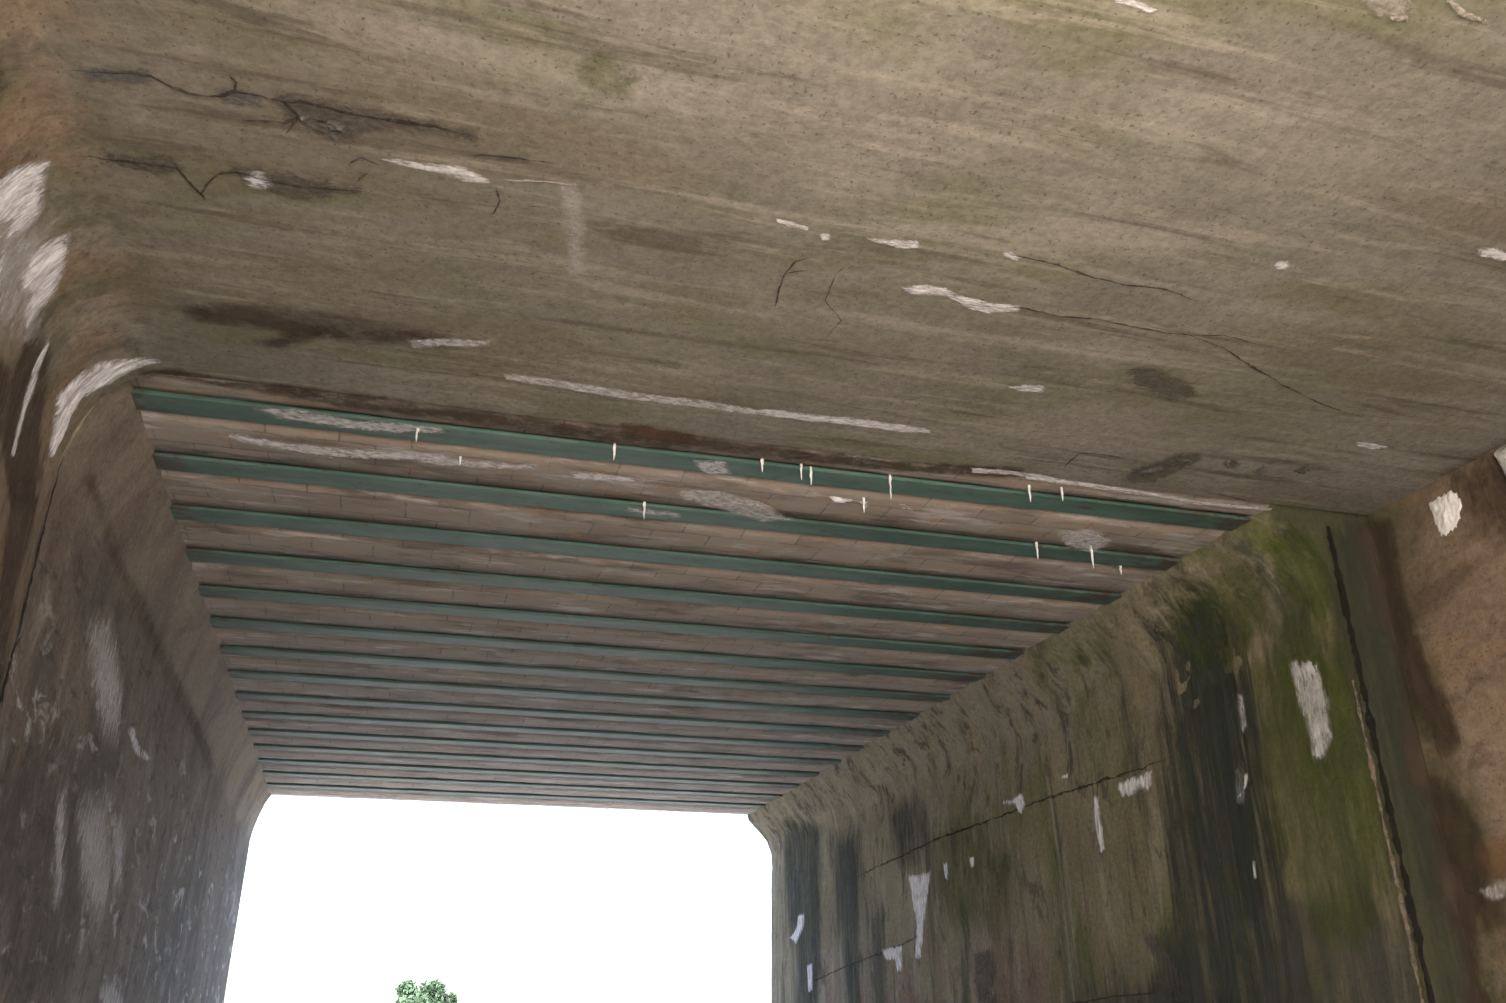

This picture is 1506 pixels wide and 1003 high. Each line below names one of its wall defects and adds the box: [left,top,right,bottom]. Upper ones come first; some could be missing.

damp [0,162,48,271]
crack [71,70,576,213]
damp [384,159,488,183]
damp [776,219,830,240]
crack [943,255,1372,421]
damp [0,235,1271,684]
damp [1429,458,1506,537]
crack [846,760,1165,883]
damp [1075,597,1418,1003]
damp [1357,523,1506,1003]
crack [806,936,917,985]
damp [776,797,948,1003]